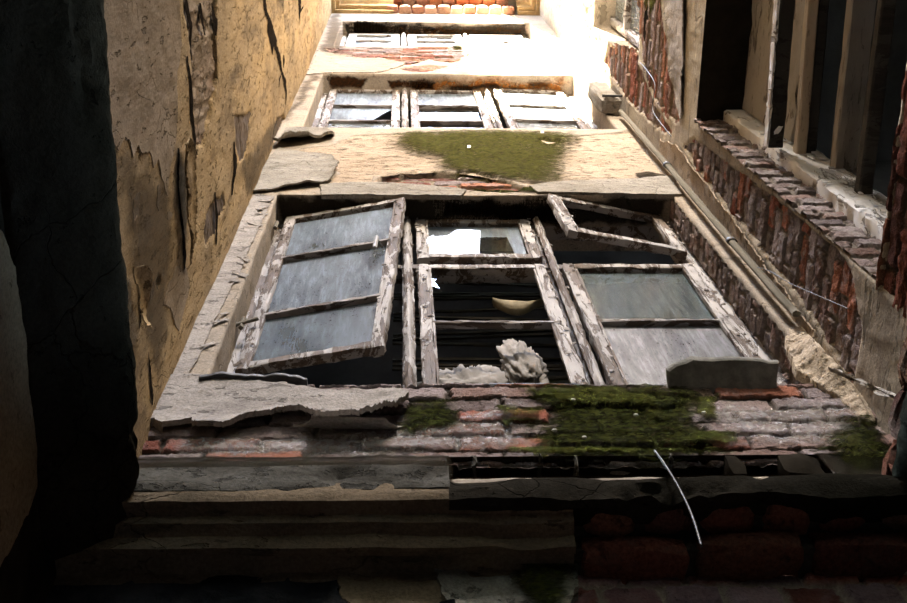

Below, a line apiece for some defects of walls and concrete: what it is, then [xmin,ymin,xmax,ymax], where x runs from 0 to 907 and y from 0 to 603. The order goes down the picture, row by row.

crack [263,0,287,100]
spalling [139,0,907,479]
flaking render [336,569,536,603]
spalling [550,505,907,603]